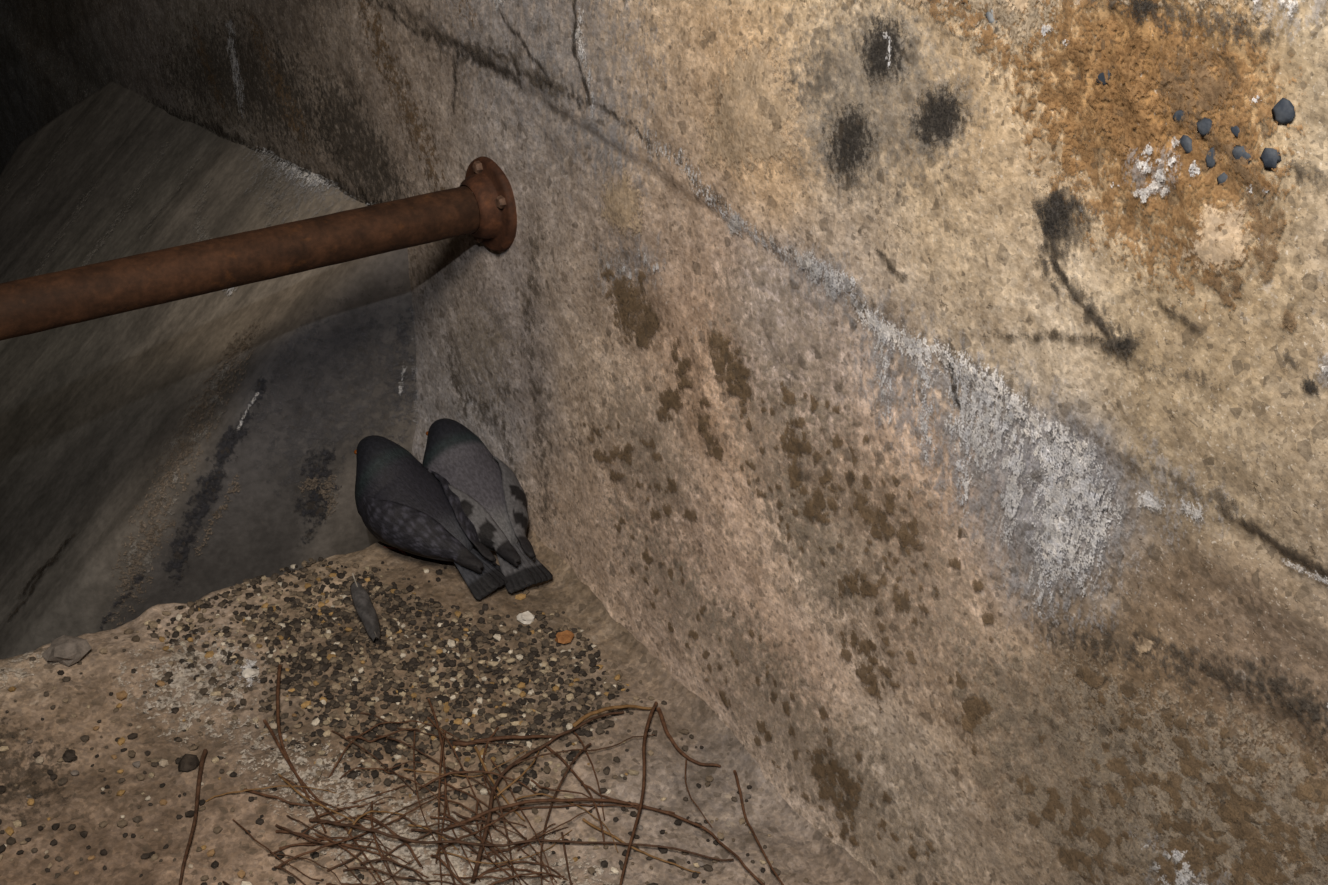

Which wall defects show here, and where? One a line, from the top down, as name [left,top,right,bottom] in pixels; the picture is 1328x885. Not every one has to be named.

crack [368,0,643,140]
corrosion [897,0,1305,315]
crack [876,249,907,278]
damp [635,127,1203,618]
crack [944,350,961,410]
crack [983,233,1220,390]
crack [1220,508,1328,585]